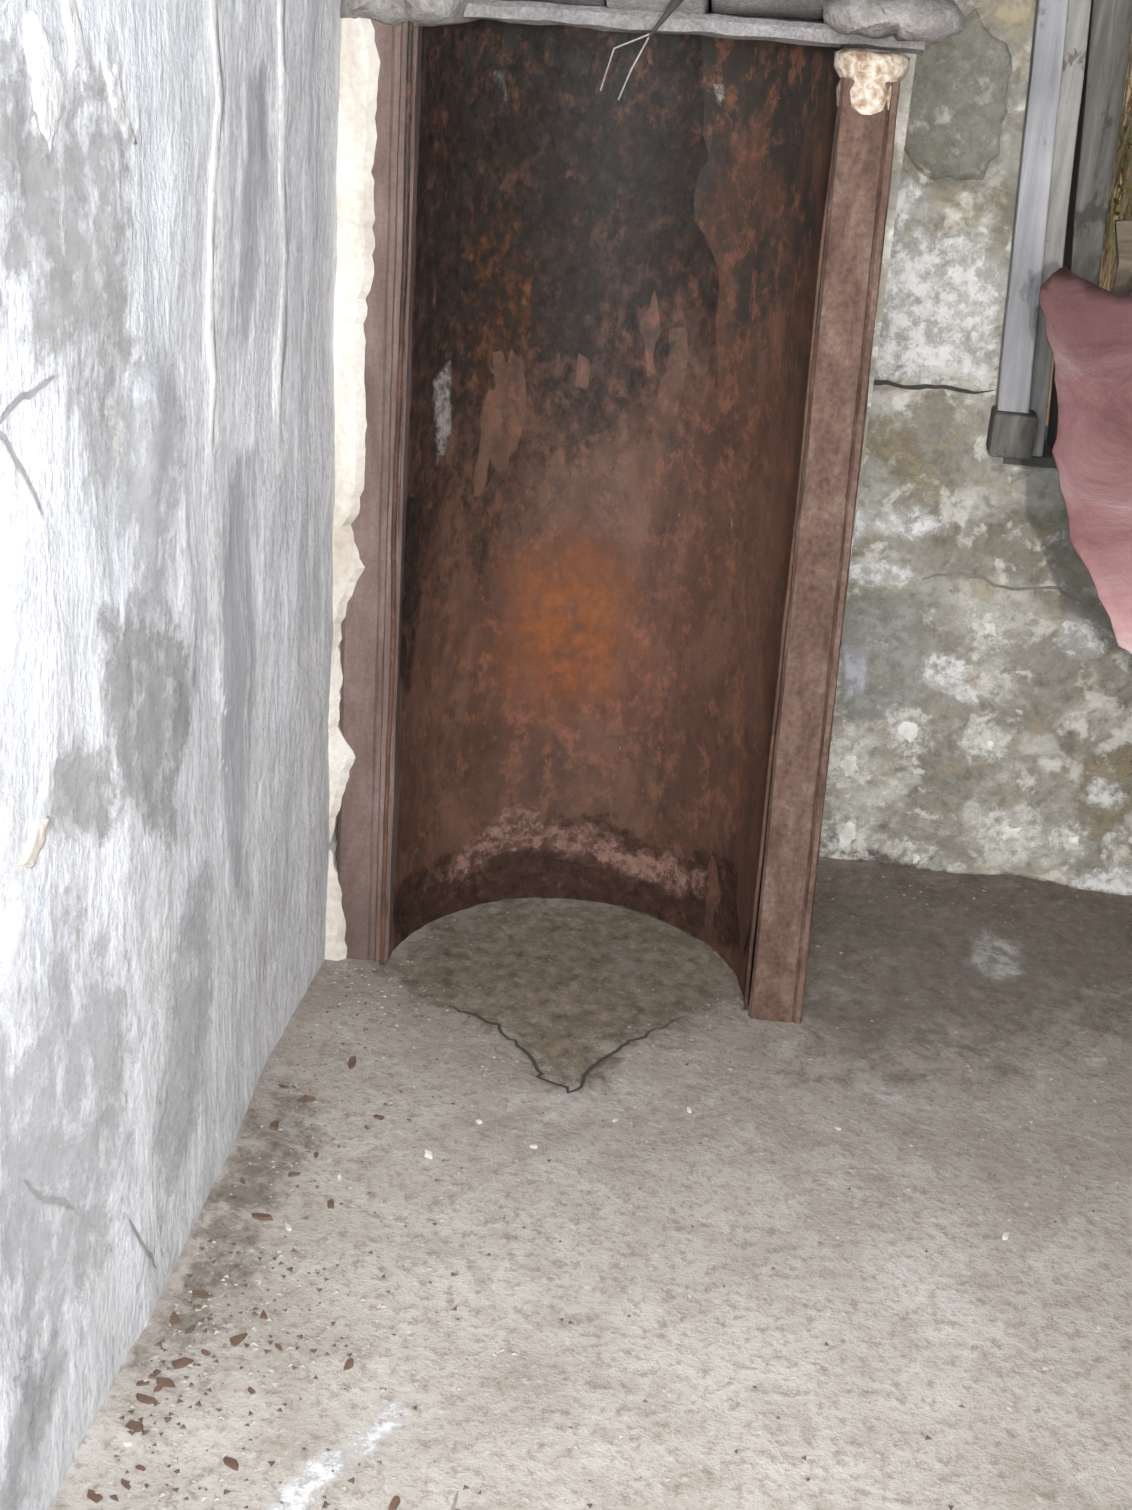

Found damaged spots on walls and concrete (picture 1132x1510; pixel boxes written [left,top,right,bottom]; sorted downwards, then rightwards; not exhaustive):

crack [451,1492,459,1510]